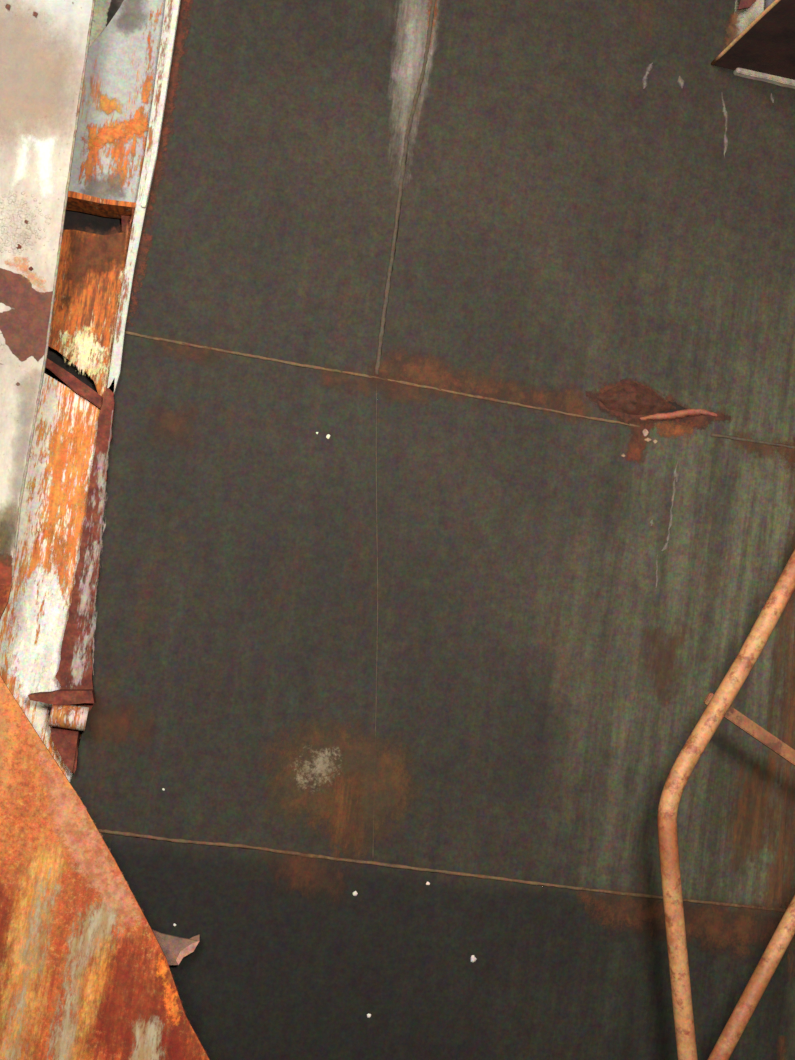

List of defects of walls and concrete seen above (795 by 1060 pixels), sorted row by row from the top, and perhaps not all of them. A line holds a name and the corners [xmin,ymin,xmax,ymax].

damp [0,4,61,128]
damp [392,0,437,154]
rust [0,0,193,361]
rust [627,420,693,462]
rust [0,508,17,586]
rust [28,420,97,612]
rust [0,844,66,1060]
rust [87,939,201,1060]
rust [580,892,666,936]
rust [683,903,789,955]